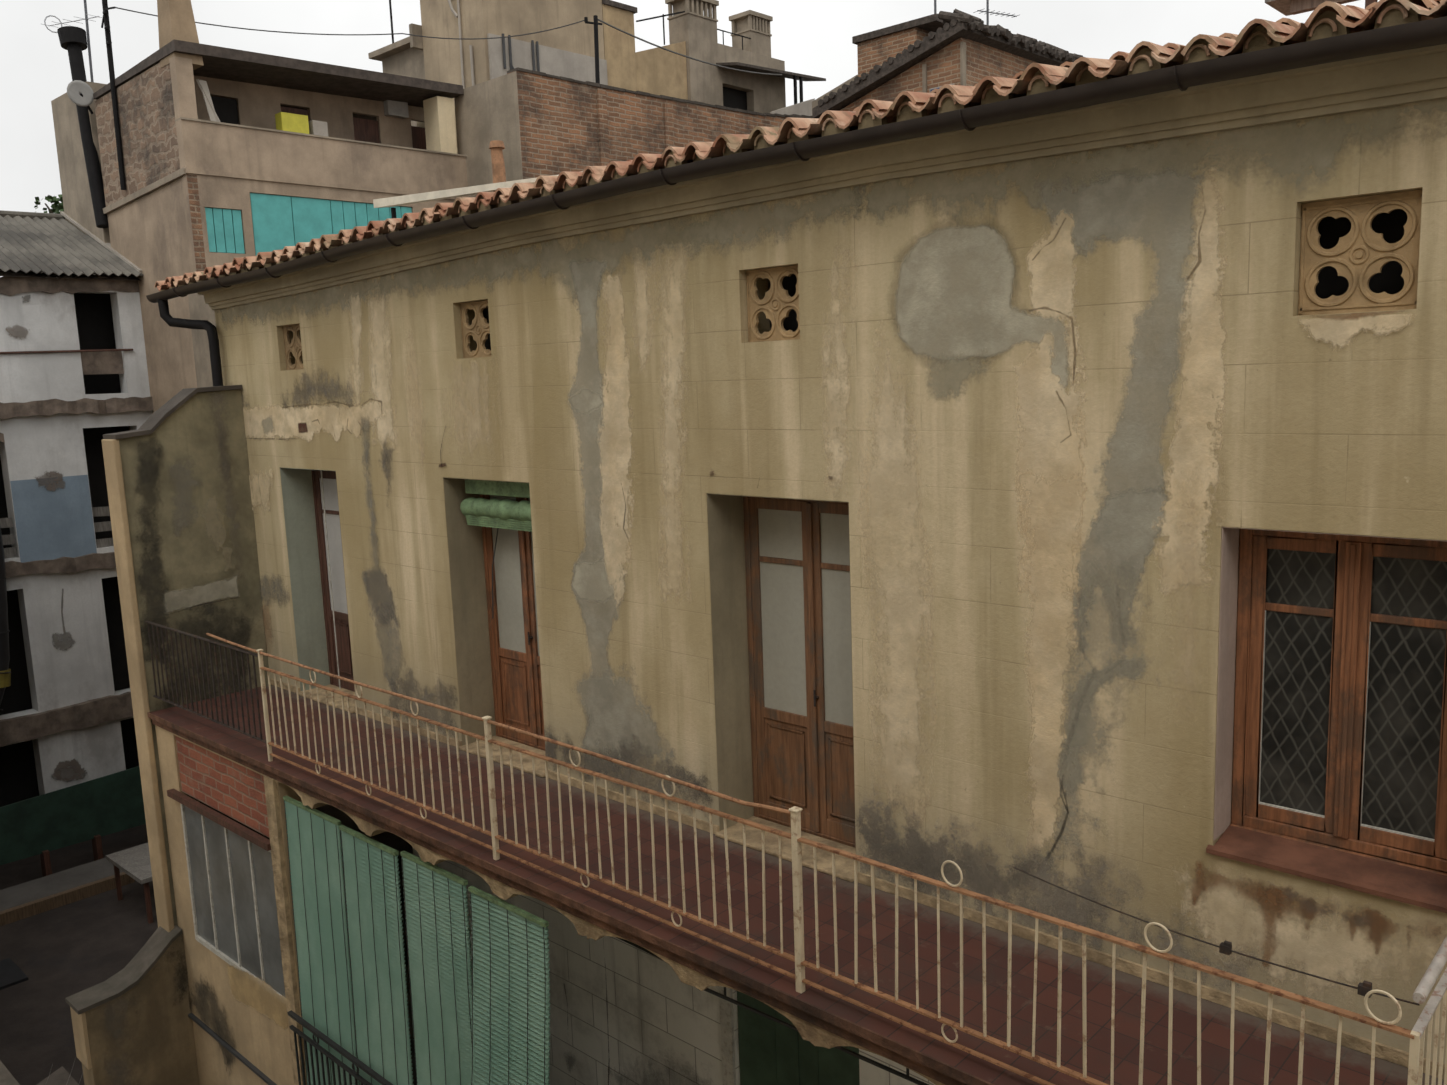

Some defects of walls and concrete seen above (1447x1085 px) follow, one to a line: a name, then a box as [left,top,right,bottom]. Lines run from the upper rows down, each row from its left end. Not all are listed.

damp [138,441,250,708]
damp [284,295,452,733]
damp [823,257,1125,950]
peeling [1015,210,1086,854]
crack [1037,169,1201,864]
peeling [1155,168,1227,593]
damp [1157,876,1439,991]